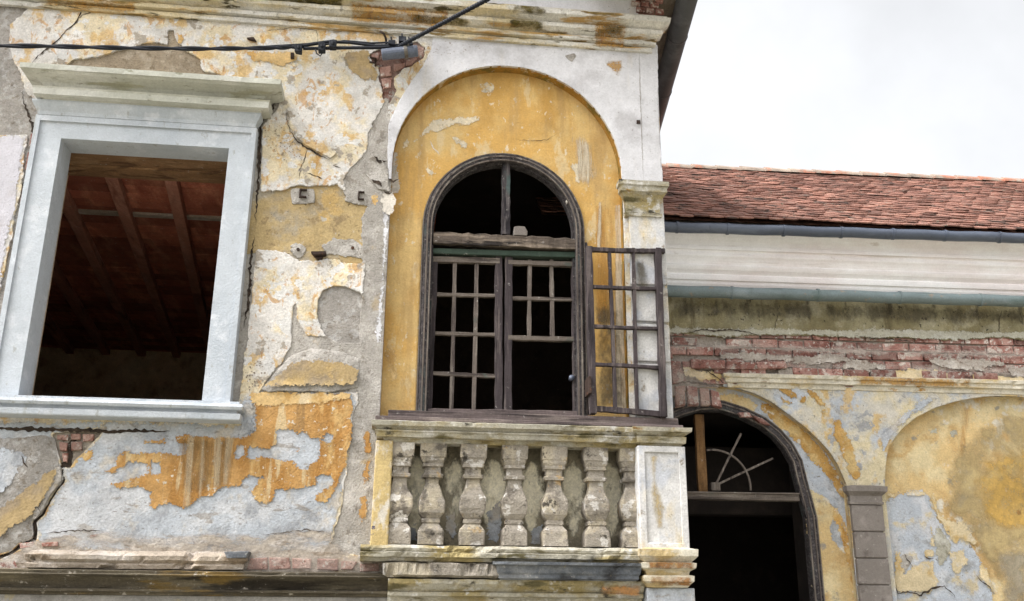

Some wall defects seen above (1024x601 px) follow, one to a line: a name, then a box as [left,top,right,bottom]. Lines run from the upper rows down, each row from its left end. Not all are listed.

crack [35,12,91,59]
damp [353,4,447,28]
damp [595,23,625,48]
crack [244,104,340,323]
peeling [0,6,479,573]
damp [713,299,811,318]
damp [828,303,1024,324]
flaking render [669,326,1024,601]
crack [0,433,77,559]